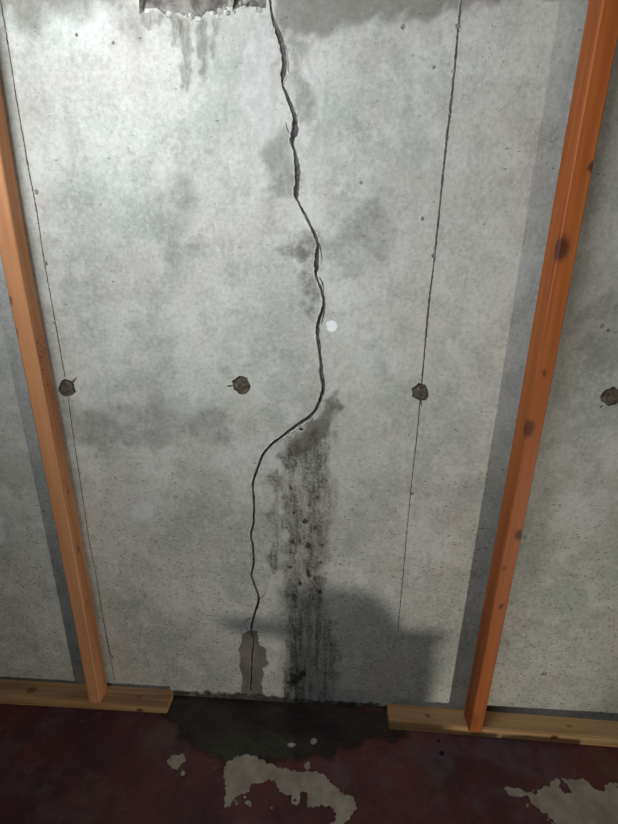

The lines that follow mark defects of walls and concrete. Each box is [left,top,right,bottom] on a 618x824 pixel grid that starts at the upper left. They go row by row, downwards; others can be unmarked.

spalling [139,0,266,22]
water stain [239,21,278,174]
water stain [297,57,316,149]
crack [243,0,326,691]
water stain [162,327,406,762]
peeling [223,754,357,824]
peeling [504,778,618,824]